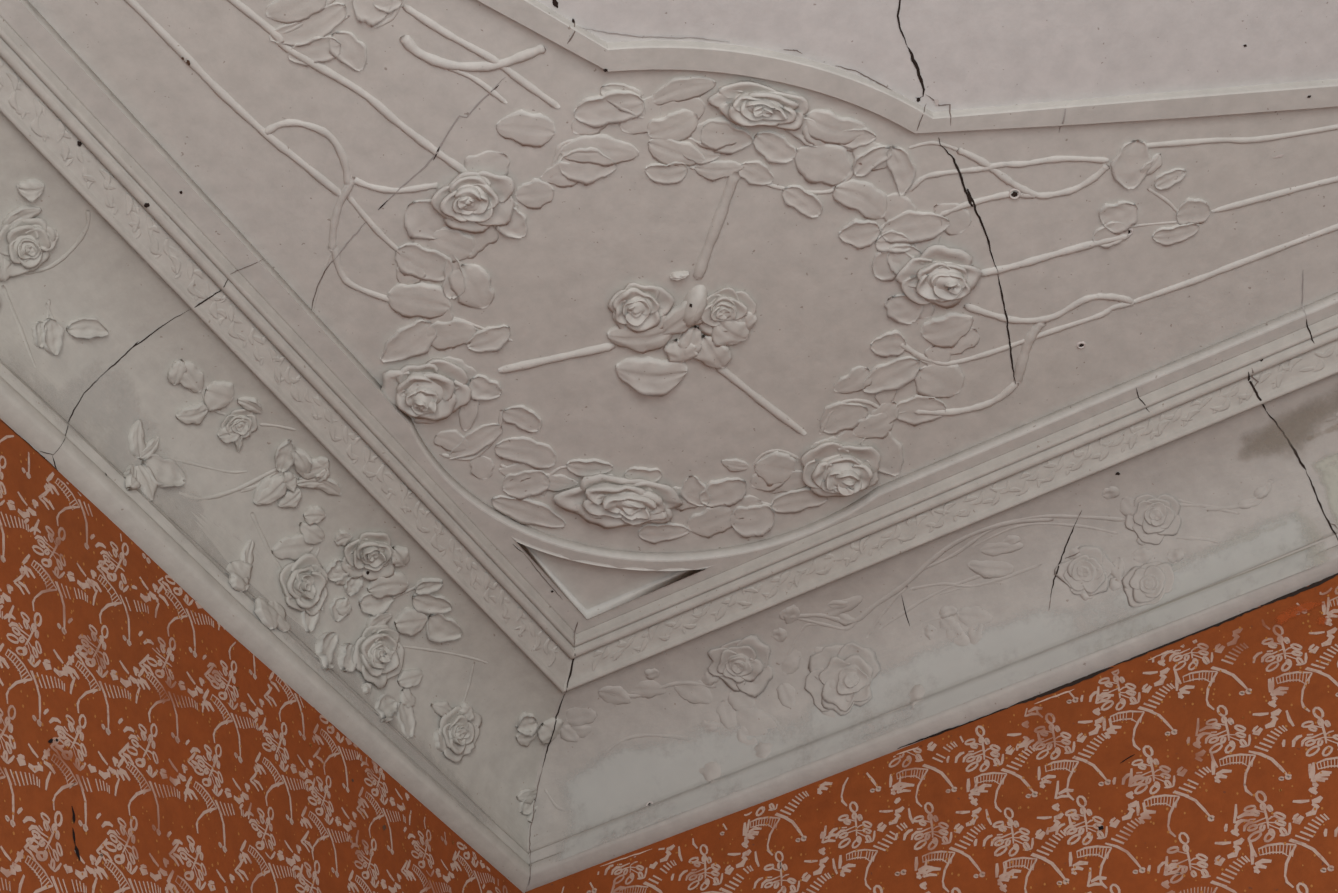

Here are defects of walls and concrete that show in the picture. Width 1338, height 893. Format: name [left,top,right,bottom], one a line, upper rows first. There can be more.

crack [552,0,728,42]
crack [838,0,1016,384]
crack [0,260,261,470]
crack [1248,369,1338,540]
crack [1049,511,1082,608]
crack [898,573,1338,749]